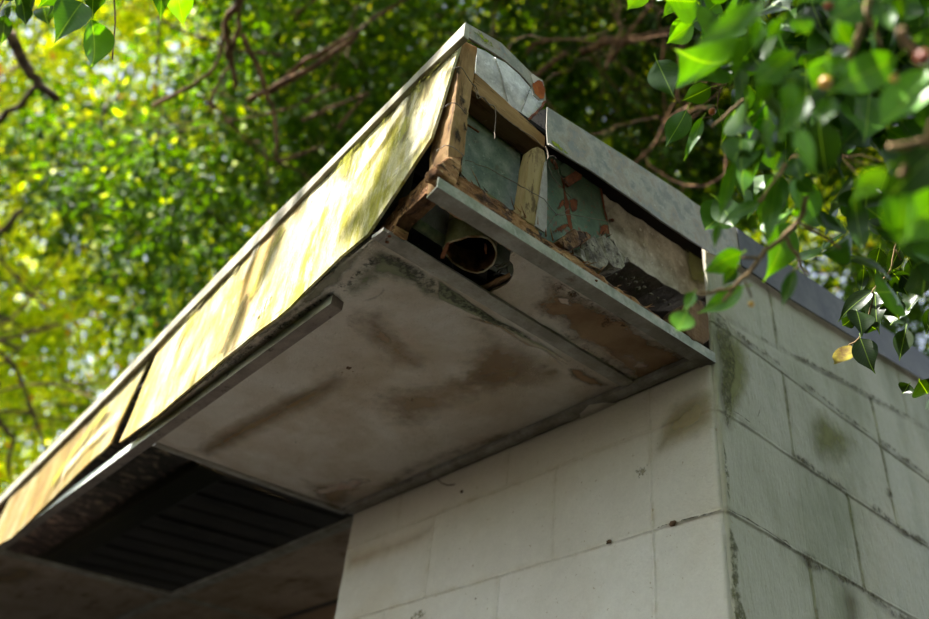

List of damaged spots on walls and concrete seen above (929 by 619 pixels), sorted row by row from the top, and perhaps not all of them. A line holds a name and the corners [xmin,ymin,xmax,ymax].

damp [349,60,461,187]
damp [233,243,260,280]
damp [212,294,330,377]
damp [348,254,562,365]
damp [538,283,682,378]
damp [205,385,330,452]